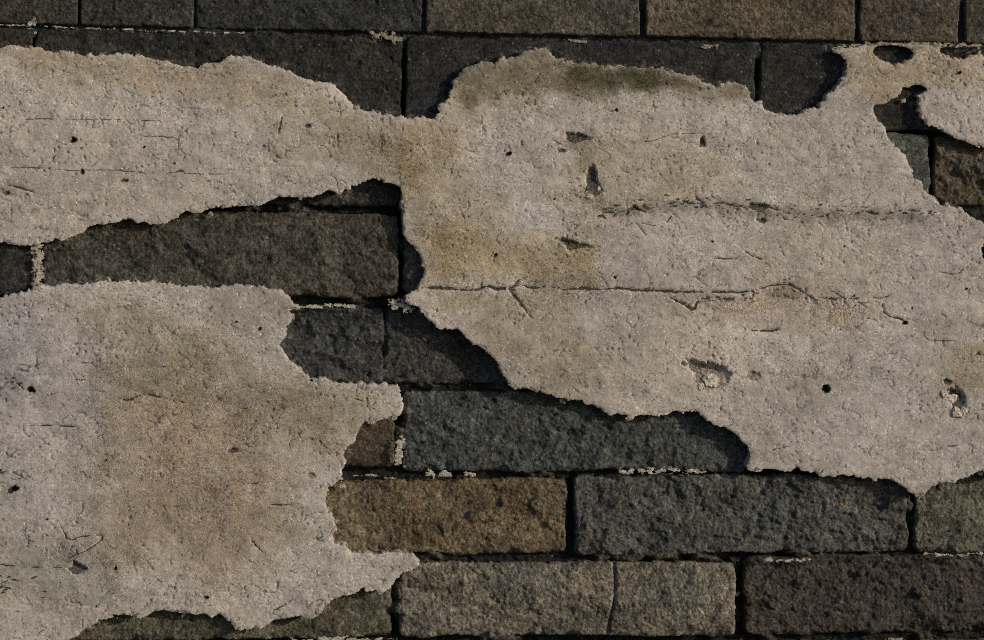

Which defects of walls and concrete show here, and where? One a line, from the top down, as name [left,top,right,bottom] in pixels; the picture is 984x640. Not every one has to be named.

peeling [1,45,746,120]
peeling [751,44,864,116]
peeling [901,87,982,146]
crack [598,194,937,223]
crack [422,269,956,342]
spalling [689,364,726,391]
spalling [940,379,968,418]
peeling [425,469,476,477]